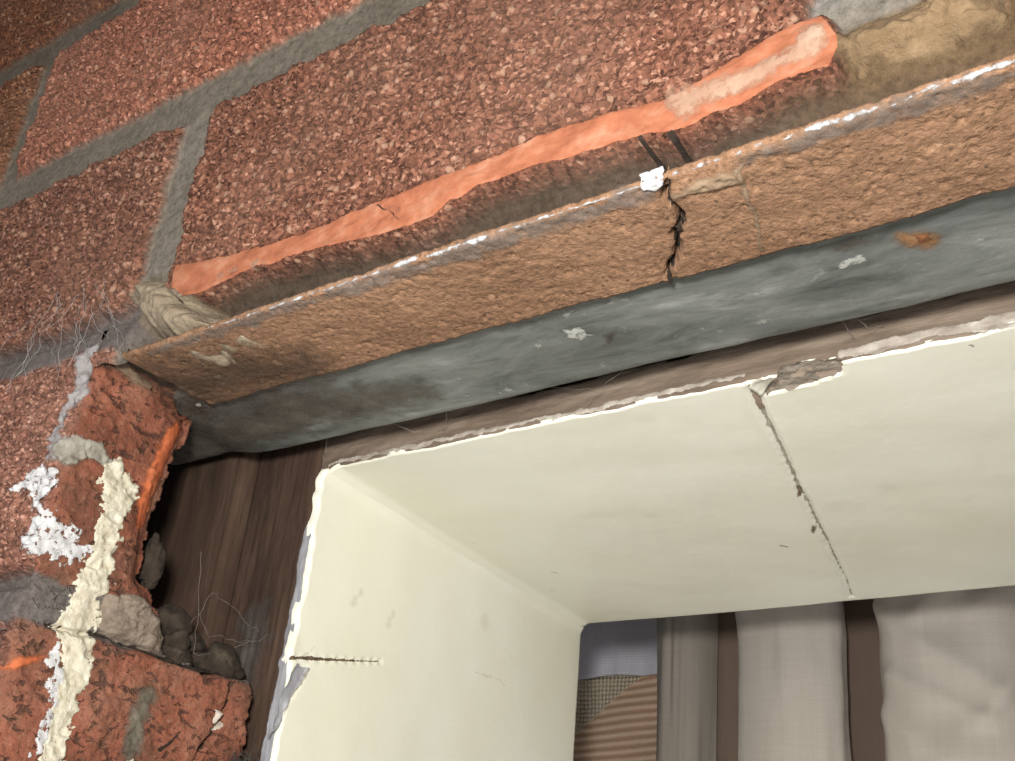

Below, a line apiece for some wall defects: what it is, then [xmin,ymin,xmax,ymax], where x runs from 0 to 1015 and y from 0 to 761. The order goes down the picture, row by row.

crack [638,130,693,284]
peeling [328,311,1015,467]
spalling [137,422,180,529]
crack [761,408,852,594]
crack [289,655,379,663]